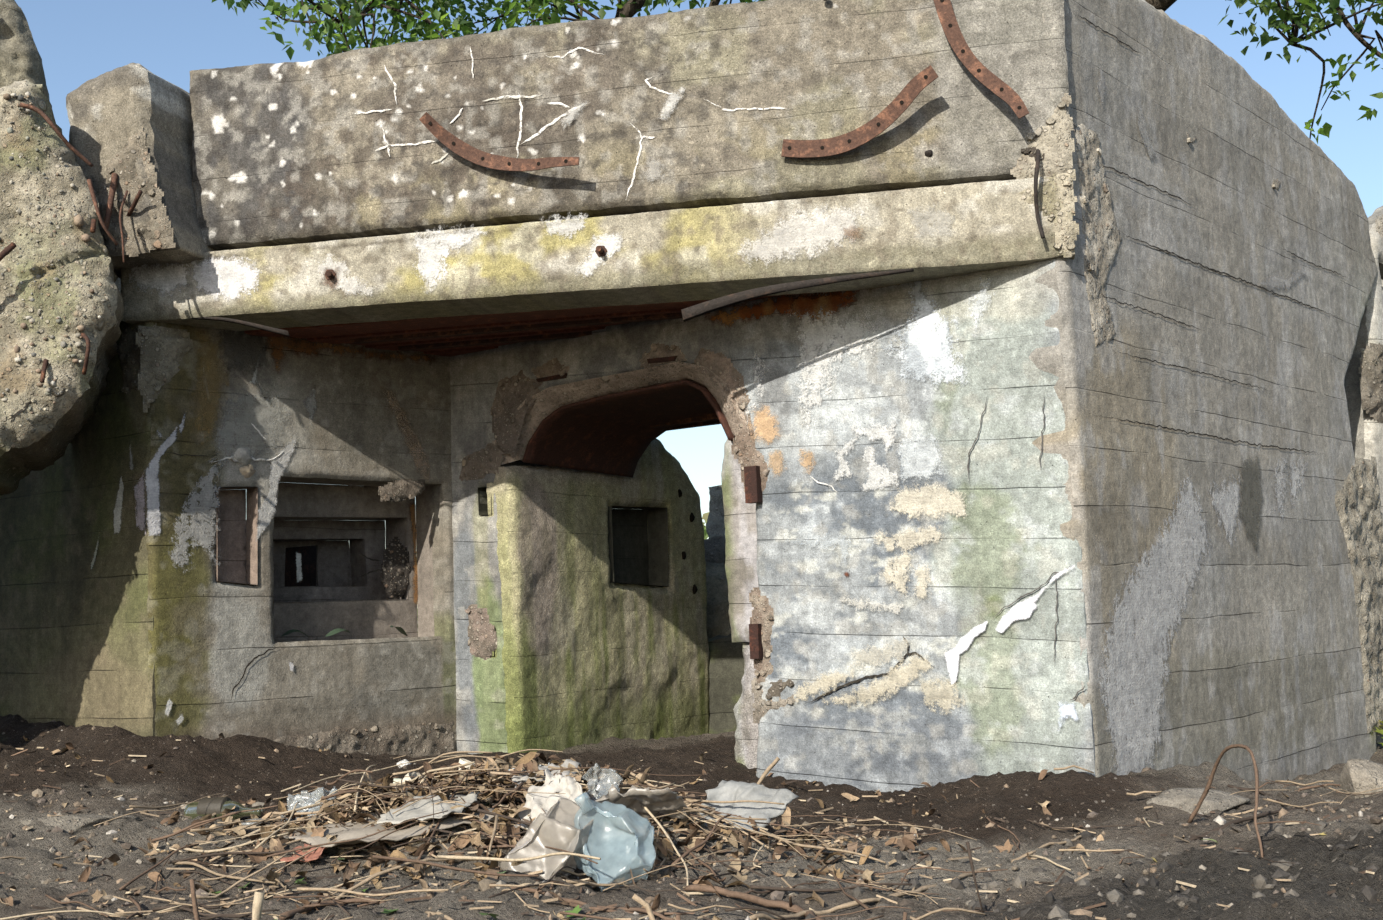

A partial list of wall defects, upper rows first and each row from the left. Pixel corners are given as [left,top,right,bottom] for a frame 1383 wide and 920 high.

crack [547,47,602,58]
crack [353,48,587,163]
crack [645,77,792,111]
crack [626,124,655,199]
spalling [1010,93,1122,347]
rust [705,287,880,326]
spalling [1358,343,1383,423]
spalling [1335,456,1383,736]
crack [805,637,932,704]